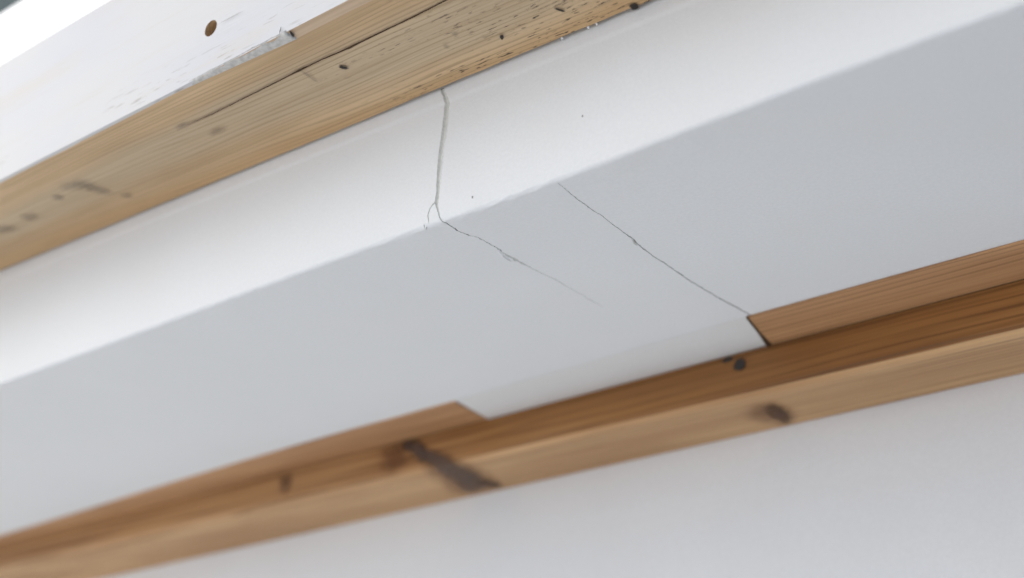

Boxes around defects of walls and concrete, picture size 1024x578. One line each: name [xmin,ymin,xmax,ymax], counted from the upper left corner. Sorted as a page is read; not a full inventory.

crack [424,89,603,307]
crack [558,183,750,315]